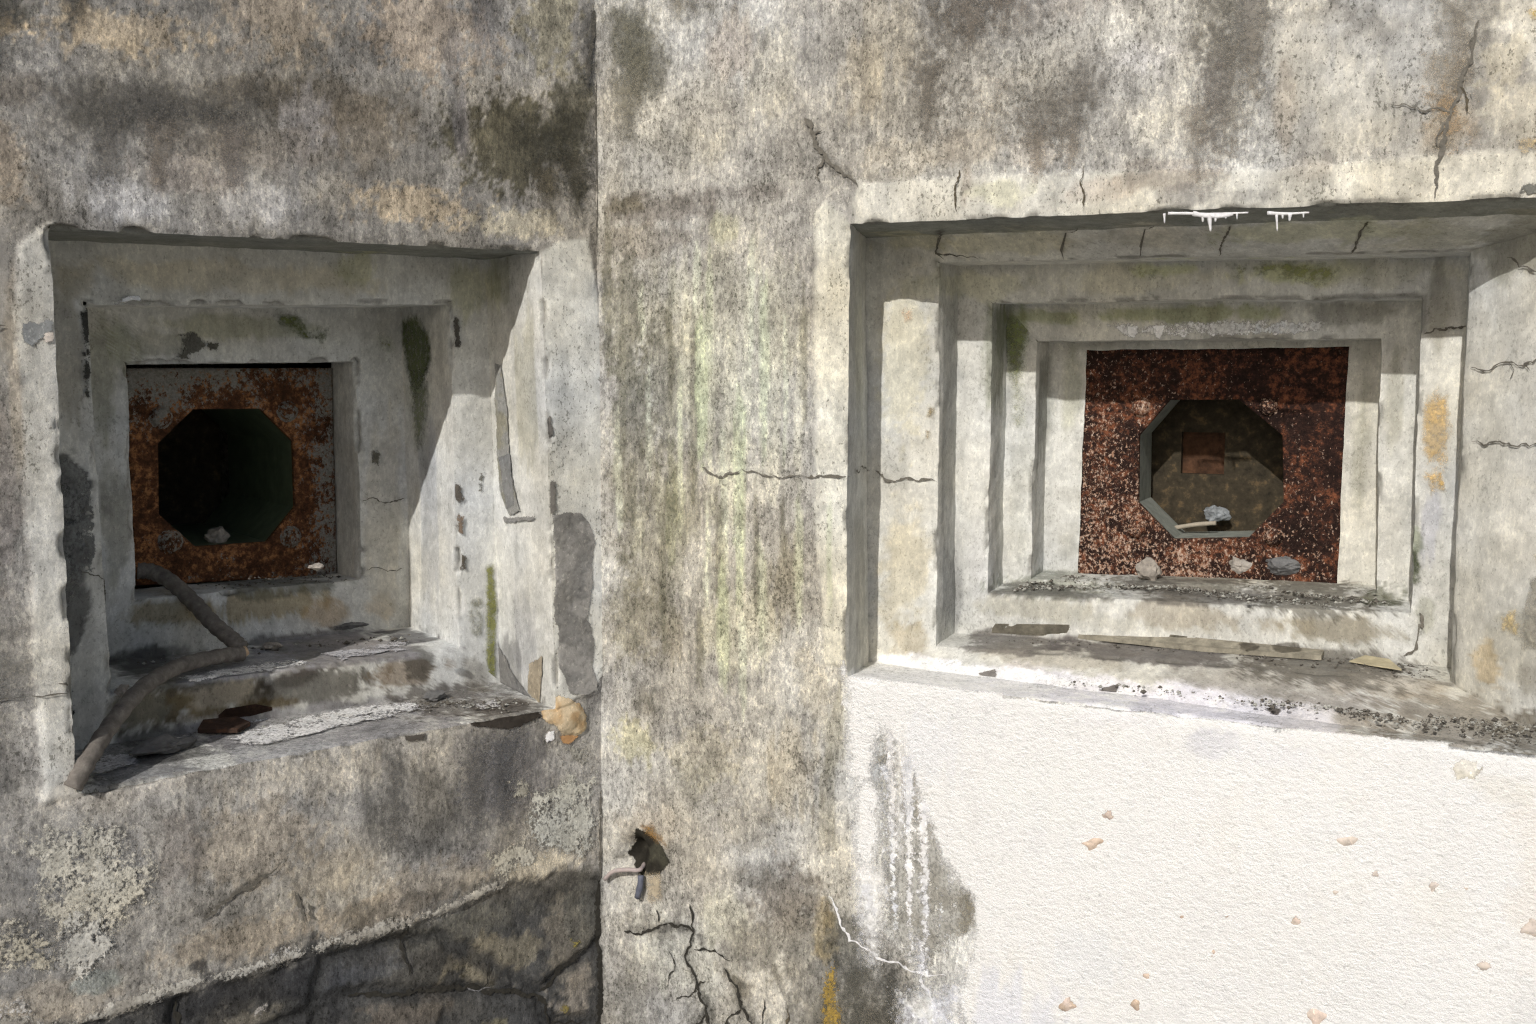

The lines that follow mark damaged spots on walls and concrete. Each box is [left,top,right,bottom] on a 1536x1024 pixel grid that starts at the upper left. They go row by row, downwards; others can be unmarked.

crack [585,10,598,253]
crack [1390,20,1479,198]
crack [1507,257,1536,272]
crack [702,465,937,483]
crack [1473,440,1536,448]
crack [204,861,316,922]
crack [348,790,790,1024]